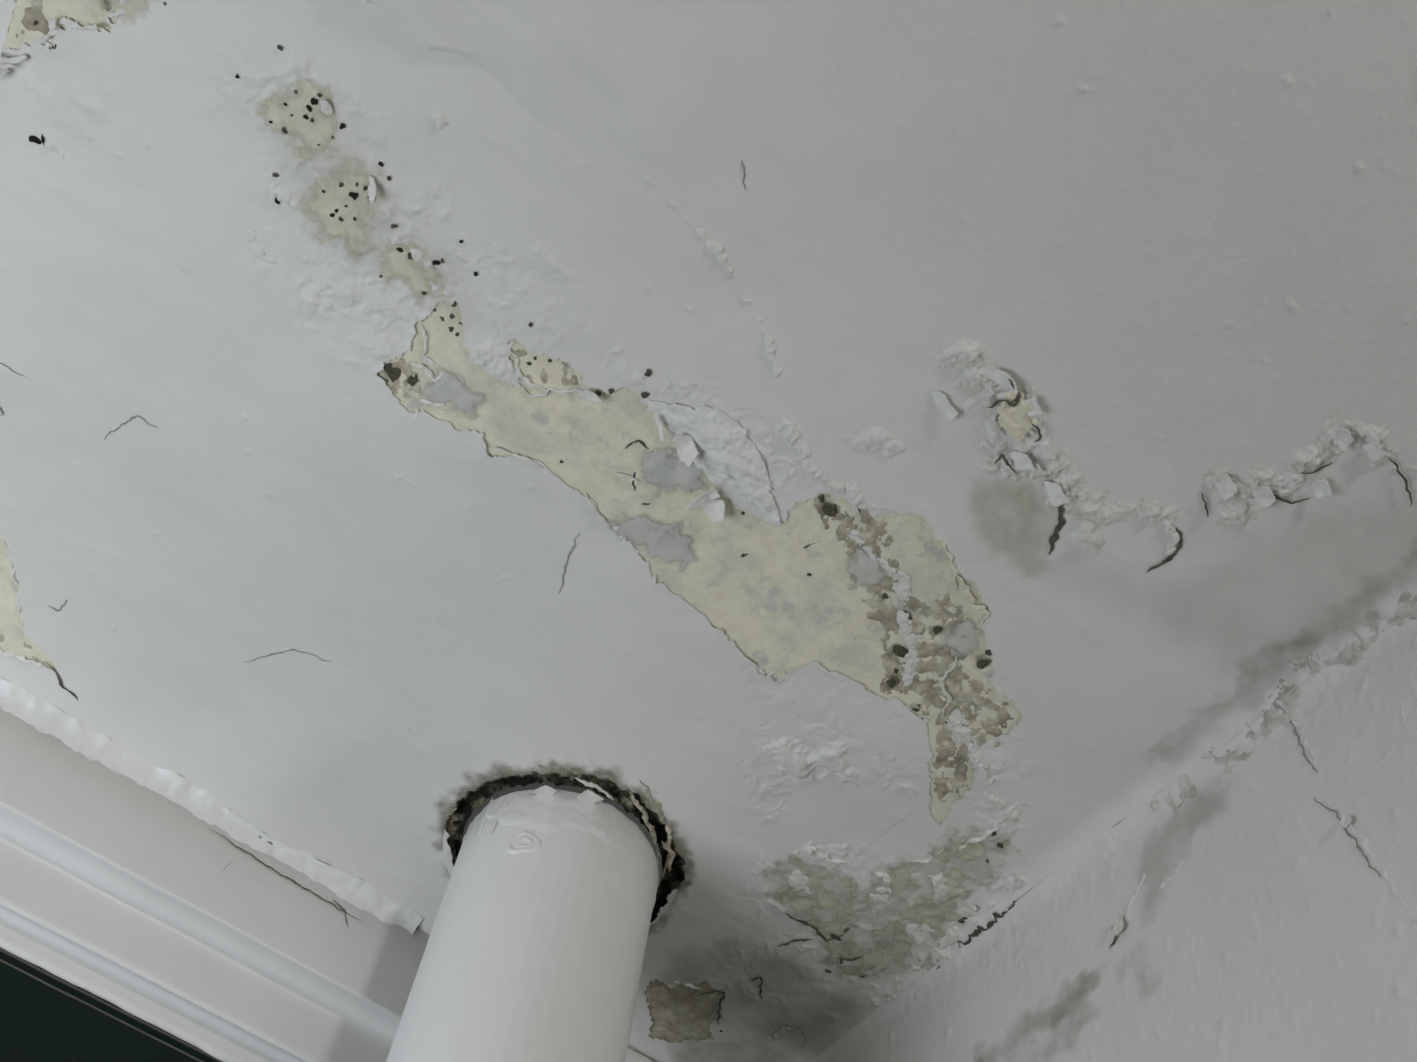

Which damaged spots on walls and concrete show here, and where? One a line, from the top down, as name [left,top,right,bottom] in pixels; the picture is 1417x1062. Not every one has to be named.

peeling [0,0,167,78]
peeling [258,80,346,157]
peeling [269,159,391,258]
peeling [929,334,1183,572]
peeling [1196,411,1417,532]
peeling [0,533,78,701]
peeling [377,224,1024,978]
peeling [644,979,725,1043]